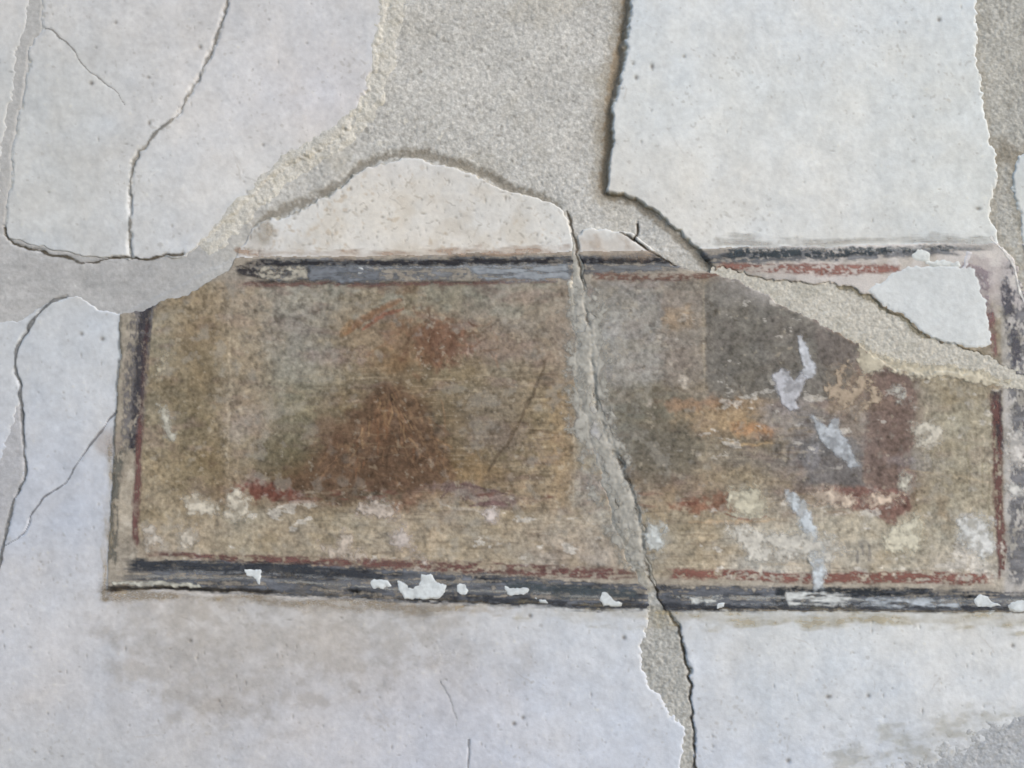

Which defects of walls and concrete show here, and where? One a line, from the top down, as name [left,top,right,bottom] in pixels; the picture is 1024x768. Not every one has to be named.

crack [46,28,125,105]
crack [130,0,228,185]
flaking render [0,0,1024,391]
crack [4,218,184,264]
crack [0,297,70,567]
crack [82,413,116,457]
crack [565,210,697,768]
peeling [370,574,468,600]
peeling [505,586,548,604]
peeling [600,592,622,607]